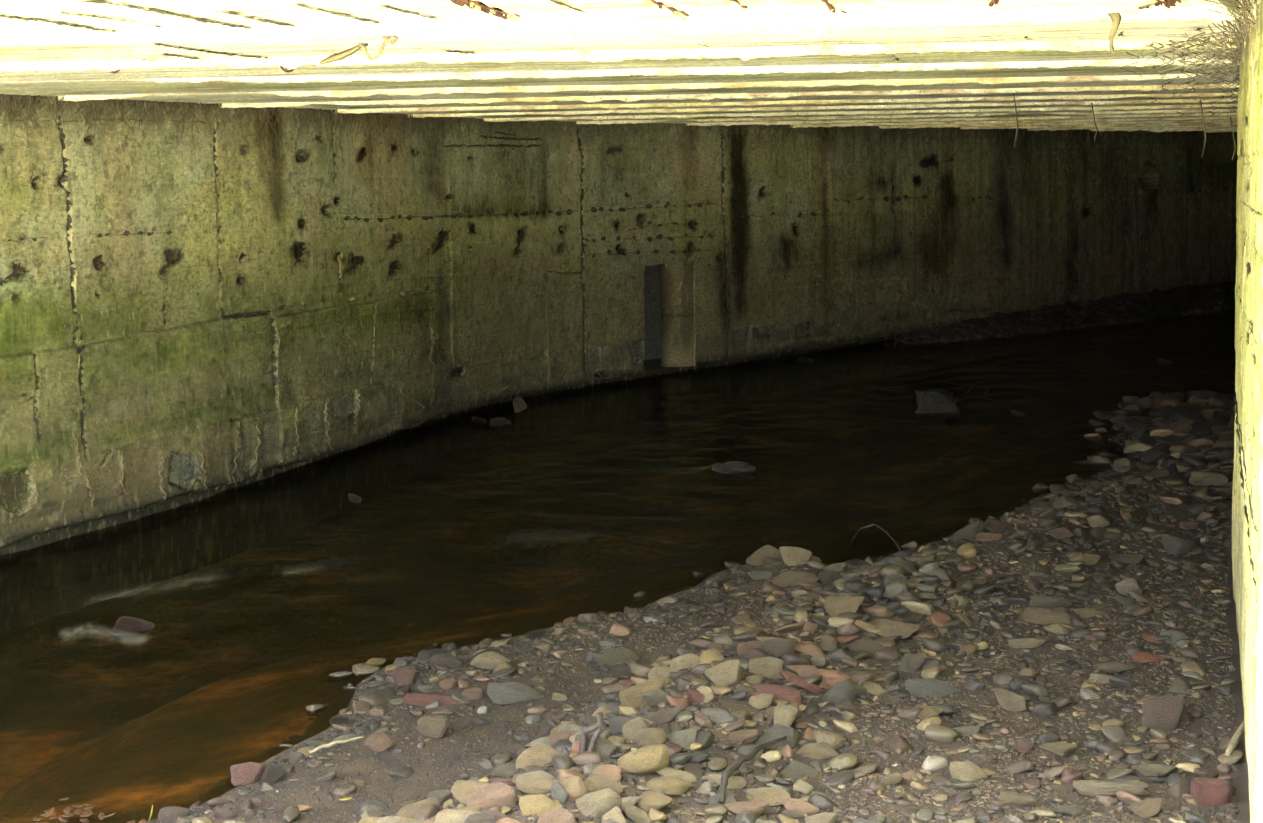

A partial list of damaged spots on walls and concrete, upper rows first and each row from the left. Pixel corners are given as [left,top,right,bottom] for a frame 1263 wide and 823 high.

crack [0,105,996,466]
damp [0,6,1256,328]
spalling [0,470,38,516]
crack [1233,391,1260,604]